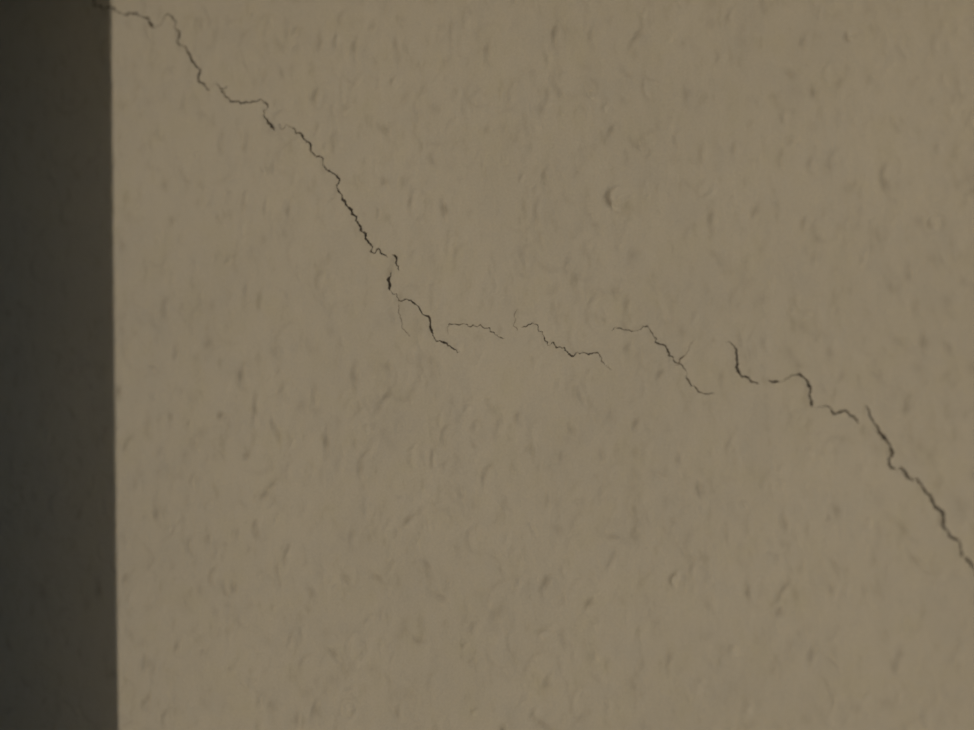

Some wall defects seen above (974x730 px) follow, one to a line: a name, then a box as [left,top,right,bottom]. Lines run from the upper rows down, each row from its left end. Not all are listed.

crack [93,0,611,370]
crack [613,326,715,395]
crack [729,341,974,568]